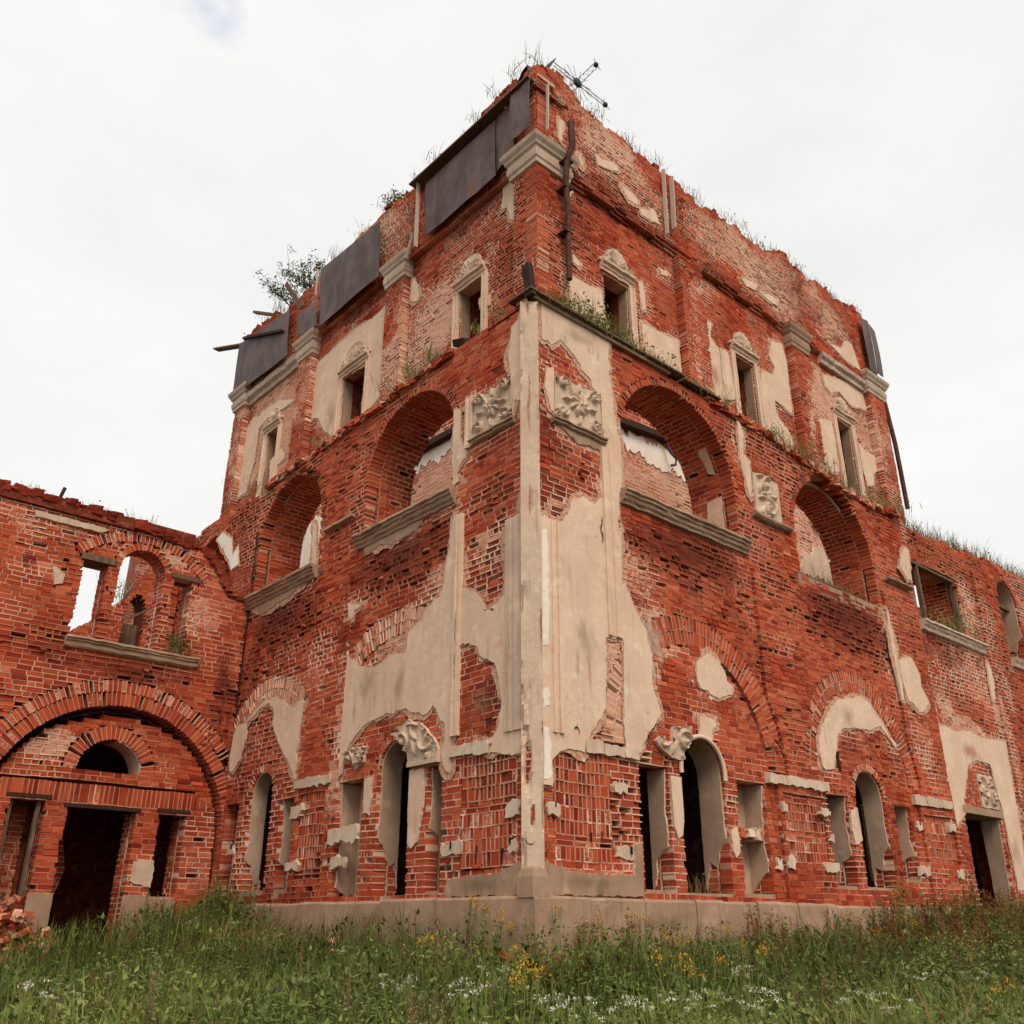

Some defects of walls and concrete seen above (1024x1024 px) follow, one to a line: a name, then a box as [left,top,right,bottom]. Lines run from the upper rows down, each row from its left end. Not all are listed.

flaking render [707,319,877,511]
flaking render [197,254,737,897]
flaking render [687,646,769,894]
flaking render [775,692,899,771]
flaking render [796,546,1024,908]
spalling [869,510,1024,719]